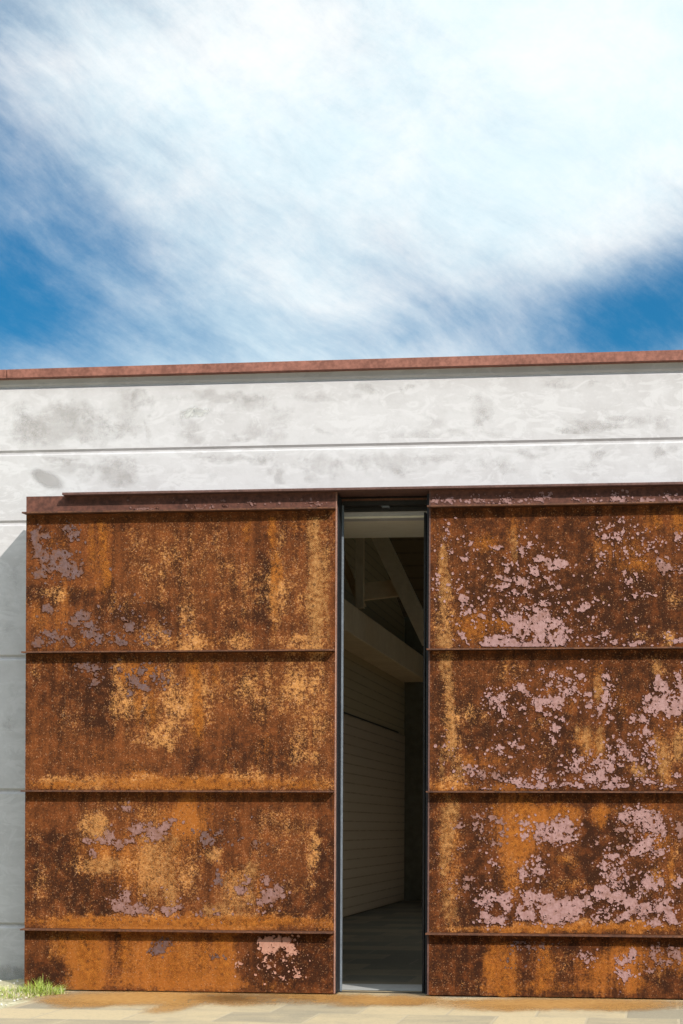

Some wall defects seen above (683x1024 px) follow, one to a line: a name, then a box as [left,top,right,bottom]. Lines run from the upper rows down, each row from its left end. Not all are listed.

peeling [27,521,194,699]
corrosion [308,518,327,623]
peeling [430,516,683,647]
peeling [434,659,683,790]
peeling [82,798,291,925]
peeling [205,935,310,985]
corrosion [442,801,459,875]
corrosion [510,802,529,848]
peeling [437,802,683,931]
corrosion [547,921,651,930]